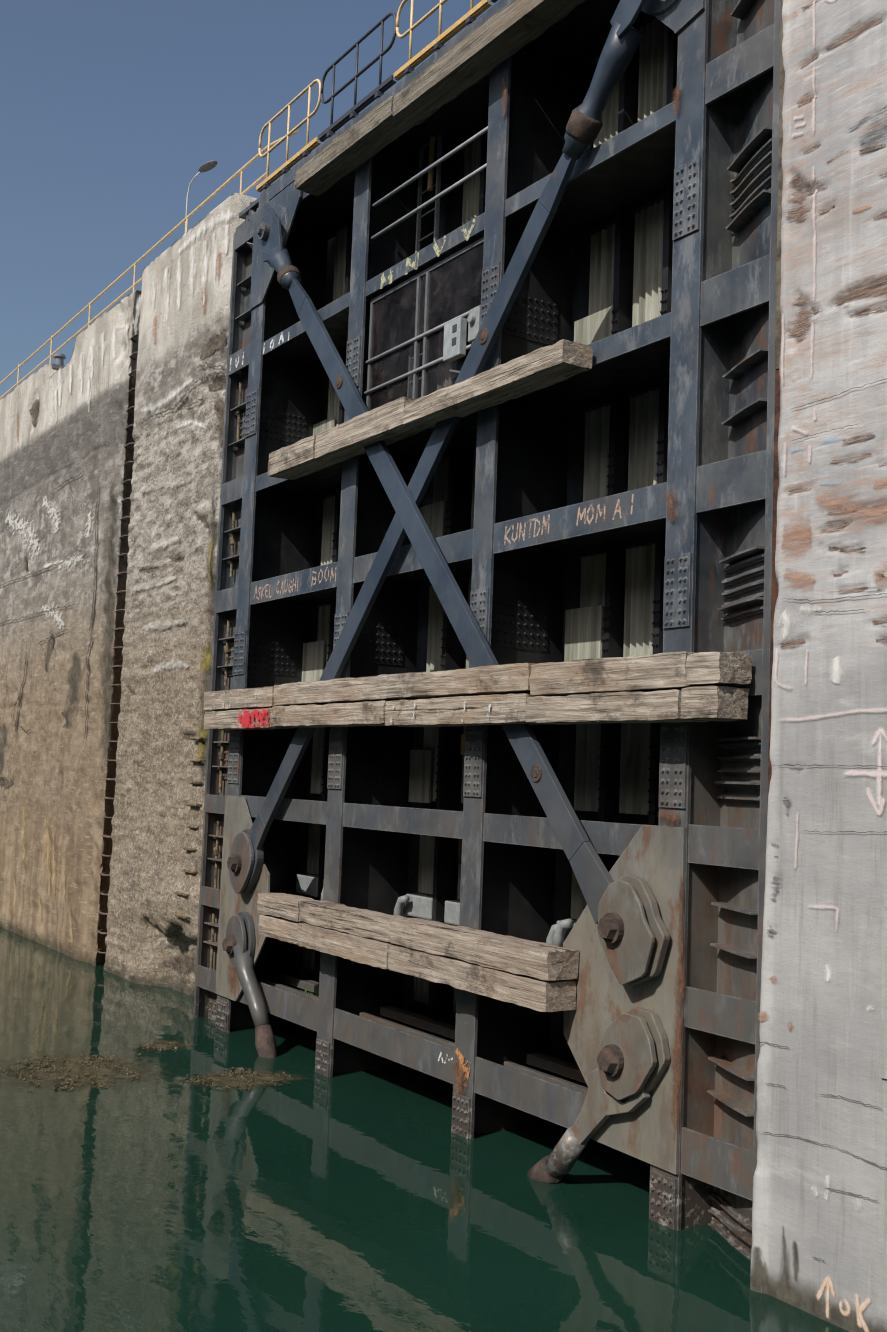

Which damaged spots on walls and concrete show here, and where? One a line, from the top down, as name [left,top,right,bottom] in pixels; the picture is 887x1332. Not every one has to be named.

corrosion [453,1048,471,1094]